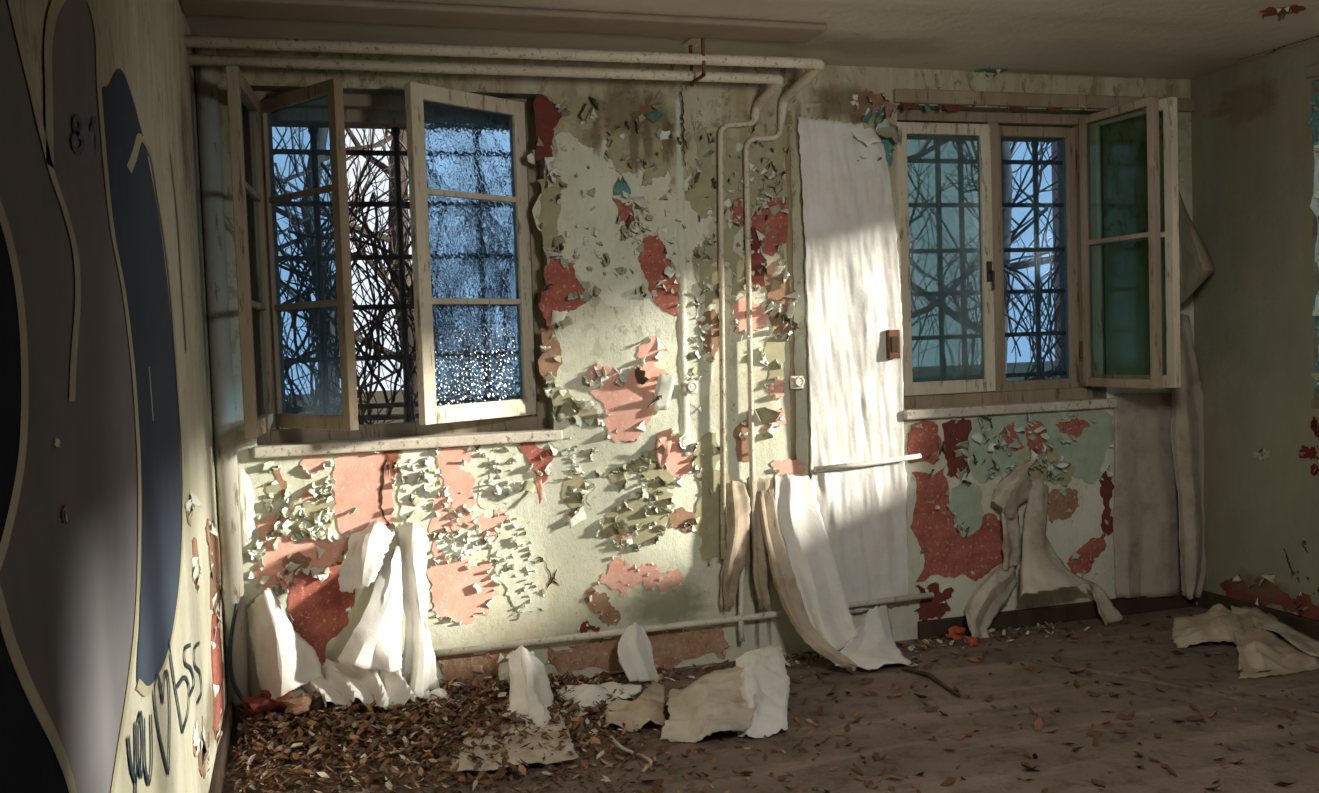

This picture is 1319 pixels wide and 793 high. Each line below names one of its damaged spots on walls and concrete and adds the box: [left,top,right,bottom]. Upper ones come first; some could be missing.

peeling [1259,5,1306,21]
peeling [1306,92,1319,268]
peeling [247,93,799,681]
peeling [1311,291,1319,390]
peeling [770,459,806,477]
peeling [907,408,1115,621]
peeling [1298,416,1319,476]
spalling [436,648,516,694]